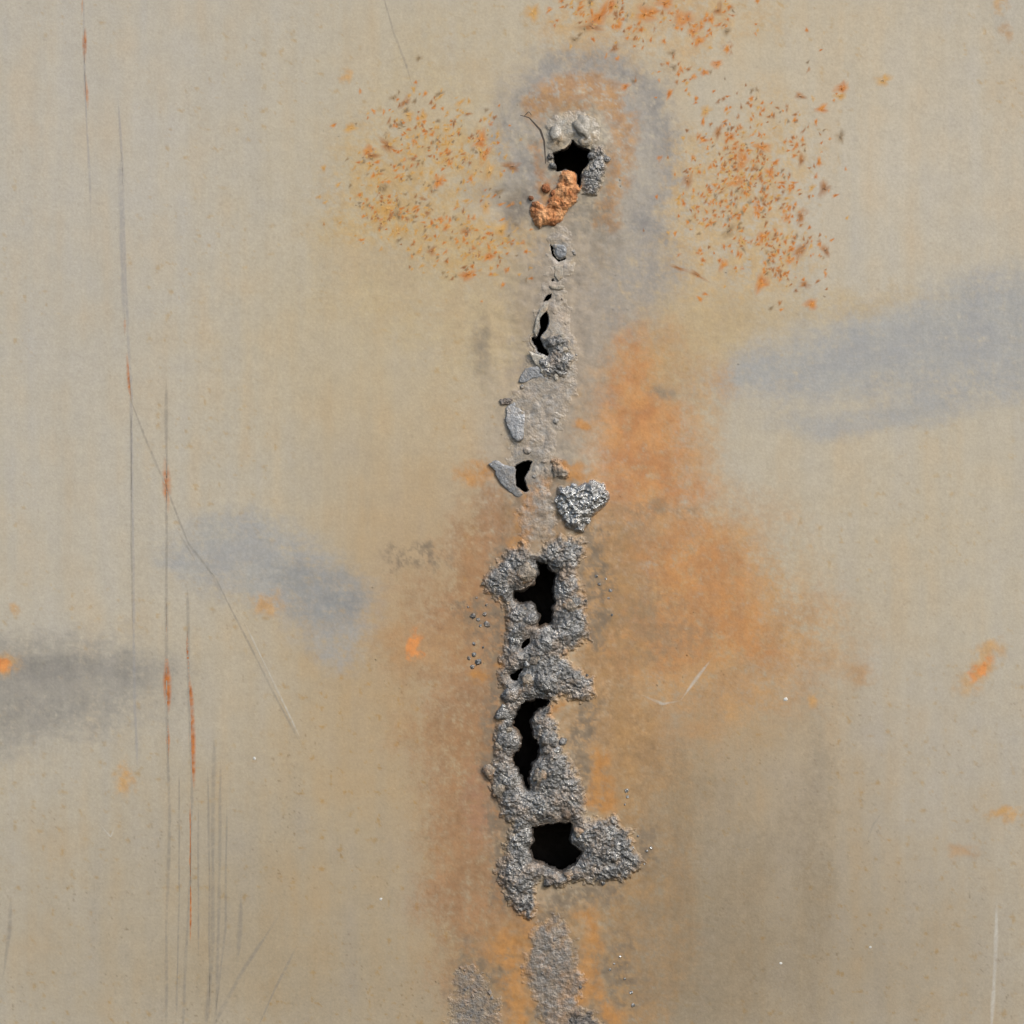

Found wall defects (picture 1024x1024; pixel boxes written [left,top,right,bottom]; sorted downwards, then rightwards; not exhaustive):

rust [299,63,556,303]
rust [509,0,898,766]
damp [0,419,206,739]
rust [162,657,173,758]
rust [186,627,197,944]
rust [584,741,624,819]
rust [472,912,540,1024]